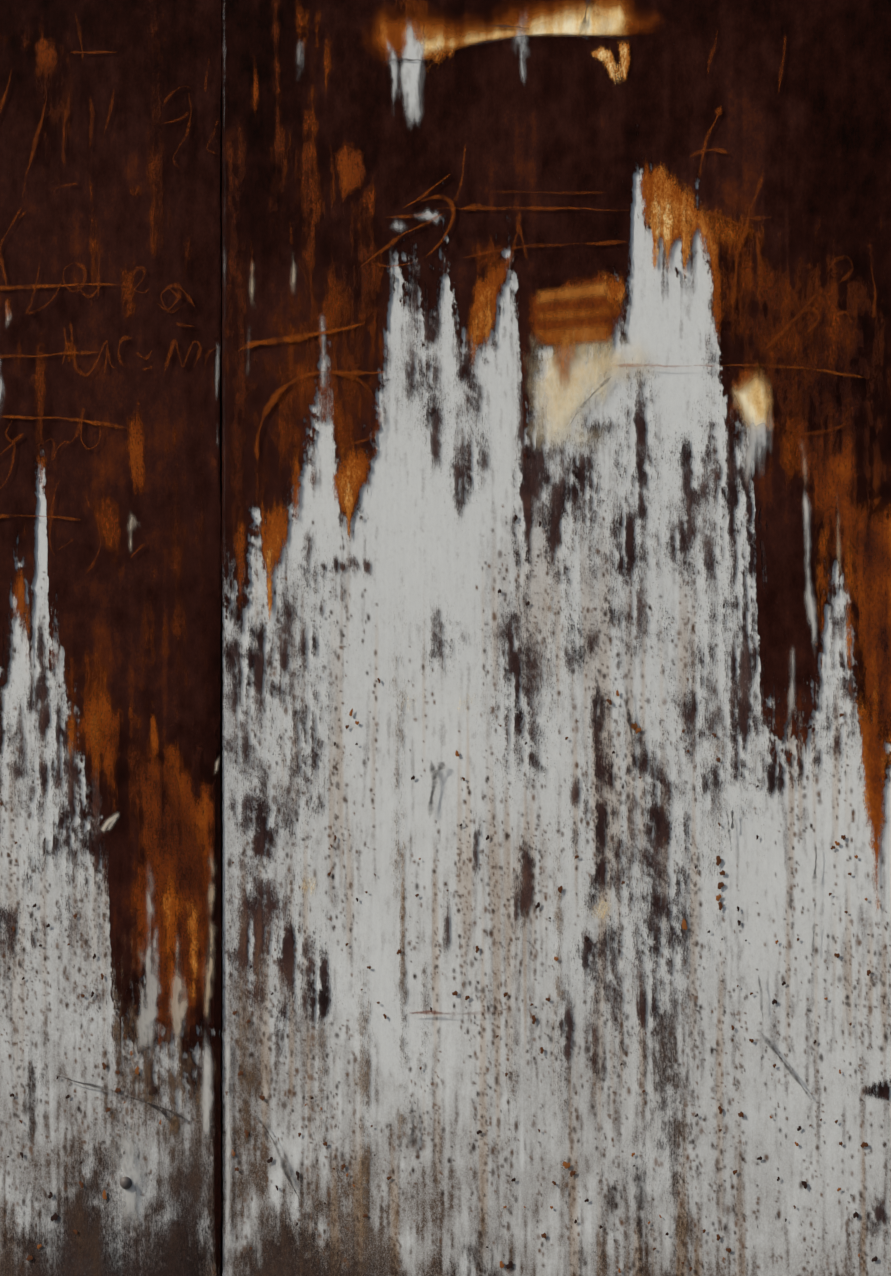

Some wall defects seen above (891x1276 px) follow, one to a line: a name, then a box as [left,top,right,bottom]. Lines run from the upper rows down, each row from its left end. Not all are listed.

corrosion [373,0,652,80]
corrosion [217,0,388,619]
corrosion [528,272,625,376]
peeling [405,350,442,466]
peeling [304,535,370,598]
peeling [452,423,488,516]
peeling [605,372,651,654]
corrosion [640,162,891,908]
peeling [299,622,316,669]
peeling [8,704,33,798]
corrosion [48,650,265,1276]
peeling [173,821,230,1219]